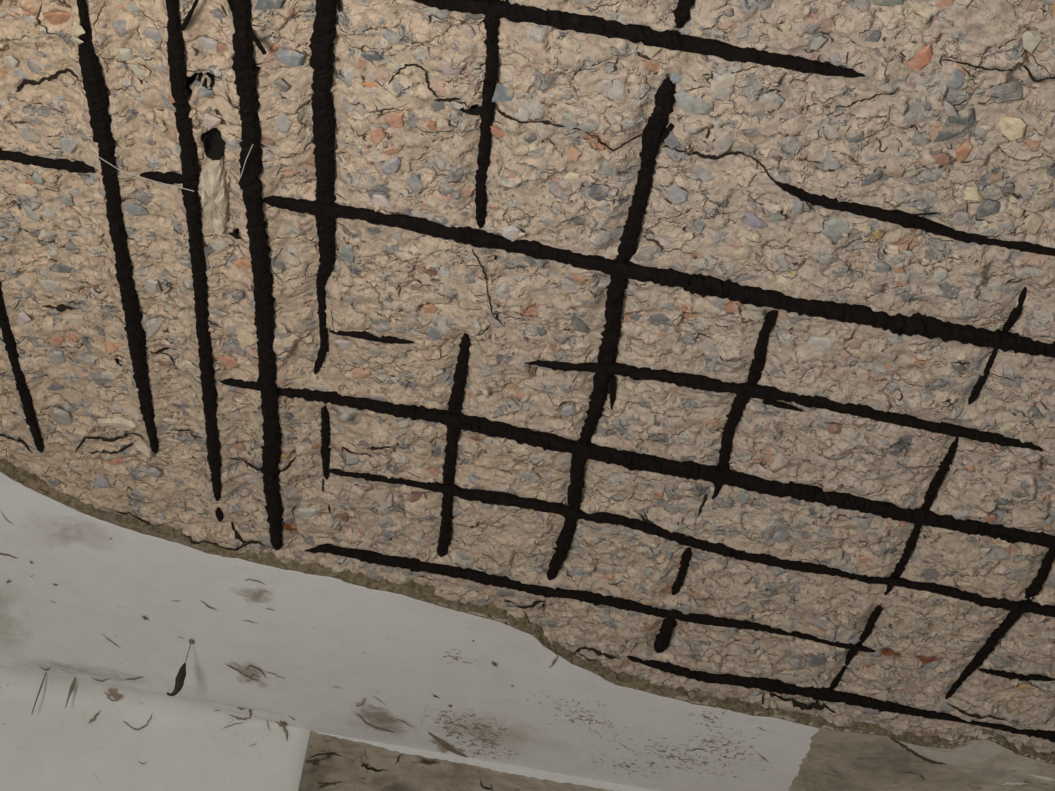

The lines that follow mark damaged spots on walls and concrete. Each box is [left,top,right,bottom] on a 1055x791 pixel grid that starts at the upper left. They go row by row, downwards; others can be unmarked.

crack [15,68,78,92]
crack [388,64,461,102]
crack [941,59,1055,83]
crack [495,106,777,183]
spalling [76,0,159,454]
spalling [165,0,225,501]
spalling [227,0,1055,557]
crack [75,433,147,454]
crack [184,522,264,551]
spalling [329,426,1055,618]
spalling [304,543,876,653]
spalling [627,656,1055,743]